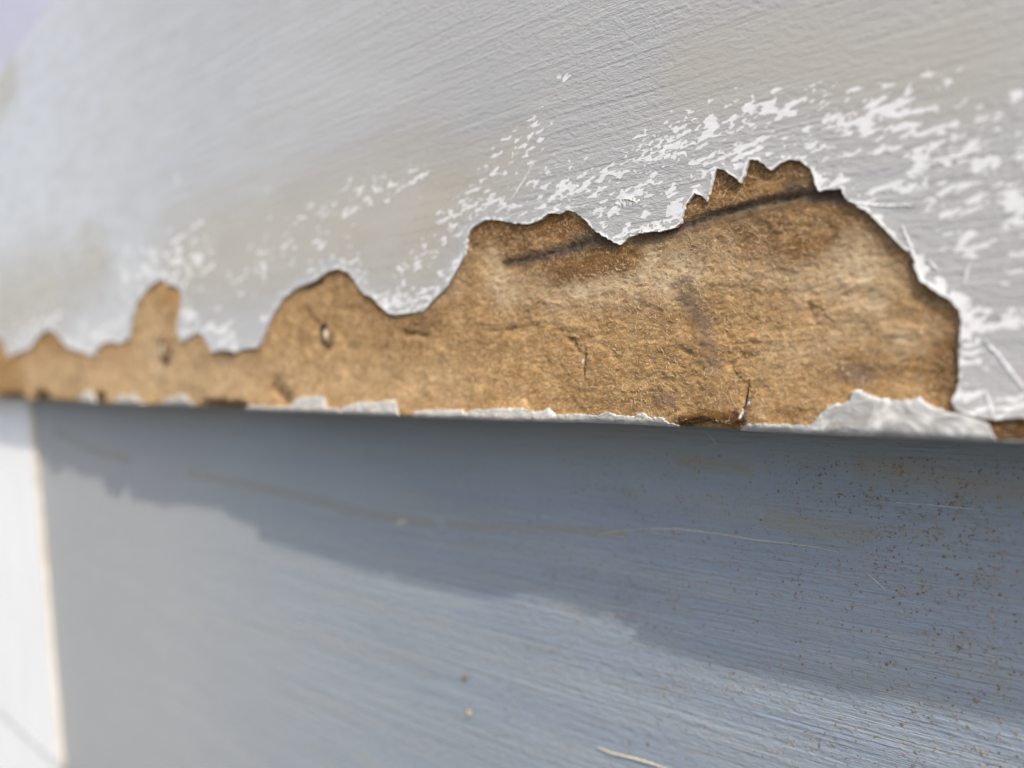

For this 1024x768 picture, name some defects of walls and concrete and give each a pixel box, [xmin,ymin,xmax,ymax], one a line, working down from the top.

peeling [0,156,1024,443]